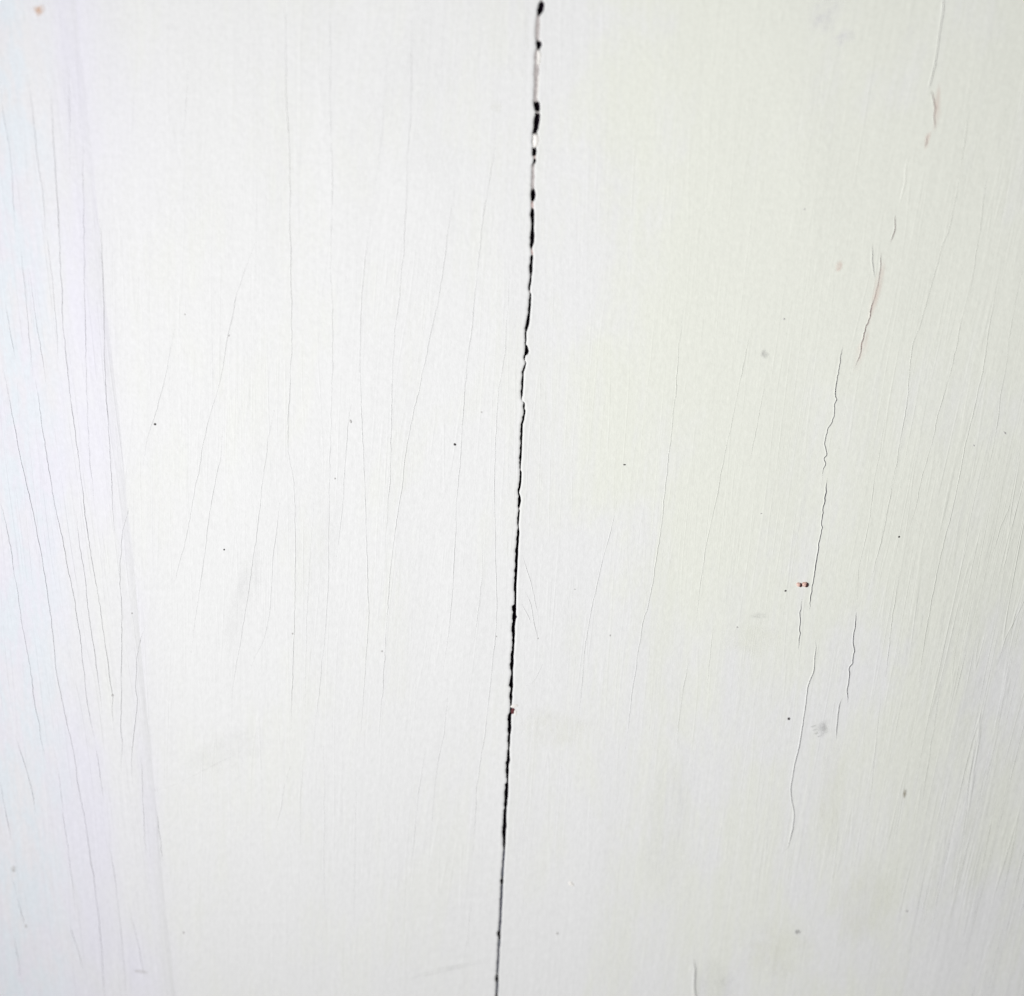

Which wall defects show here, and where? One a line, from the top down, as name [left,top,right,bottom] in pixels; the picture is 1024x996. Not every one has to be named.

crack [473,0,545,996]
crack [786,0,944,851]
crack [835,93,1024,738]